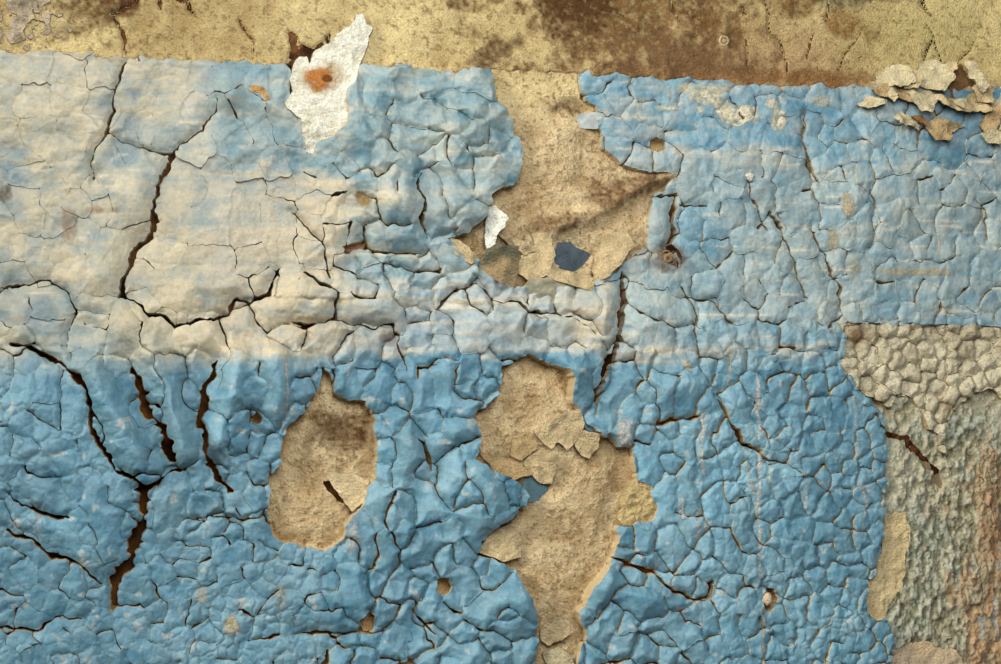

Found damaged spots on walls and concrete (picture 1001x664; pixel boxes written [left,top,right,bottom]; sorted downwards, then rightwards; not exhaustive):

peeling [0,0,63,45]
water stain [60,0,138,24]
corrosion [307,65,335,90]
water stain [472,43,512,68]
water stain [539,0,779,84]
crack [120,150,278,329]
peeling [0,31,733,664]
peeling [575,59,1001,664]
crack [9,344,233,605]
crack [323,481,344,503]
crack [885,430,939,475]
crack [611,557,711,601]